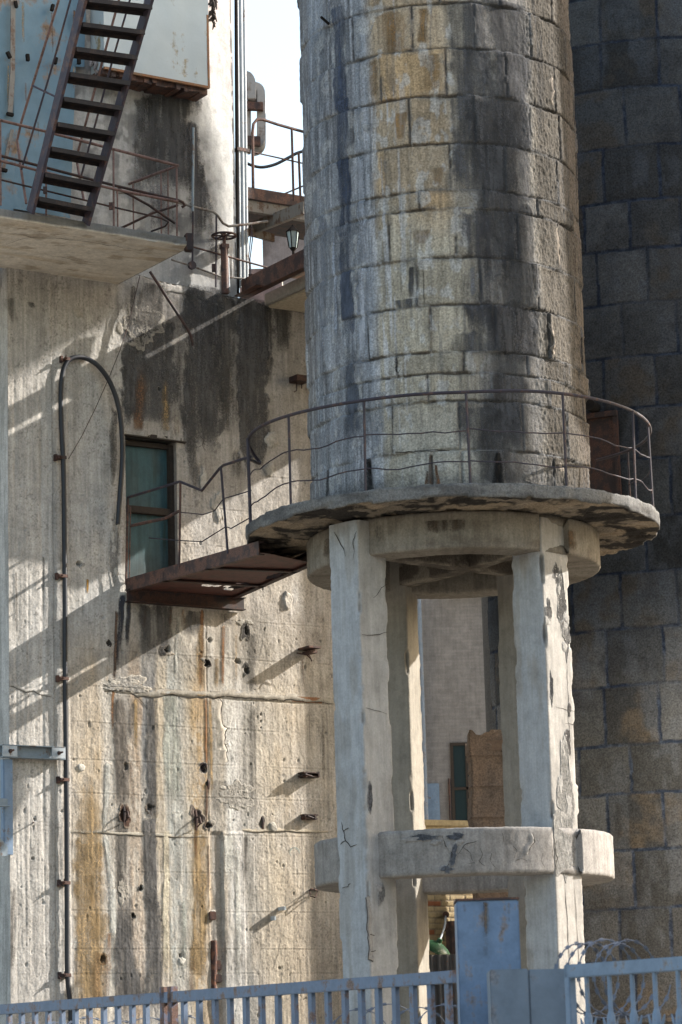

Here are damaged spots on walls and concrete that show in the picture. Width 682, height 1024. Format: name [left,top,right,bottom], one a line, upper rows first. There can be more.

damp [448,0,540,483]
damp [110,283,291,490]
spalling [103,674,152,695]
corrosion [197,610,237,684]
crack [103,684,333,763]
spalling [545,562,571,662]
corrosion [72,787,111,998]
corrosion [190,699,213,987]
crack [243,823,357,847]
crack [442,833,579,959]